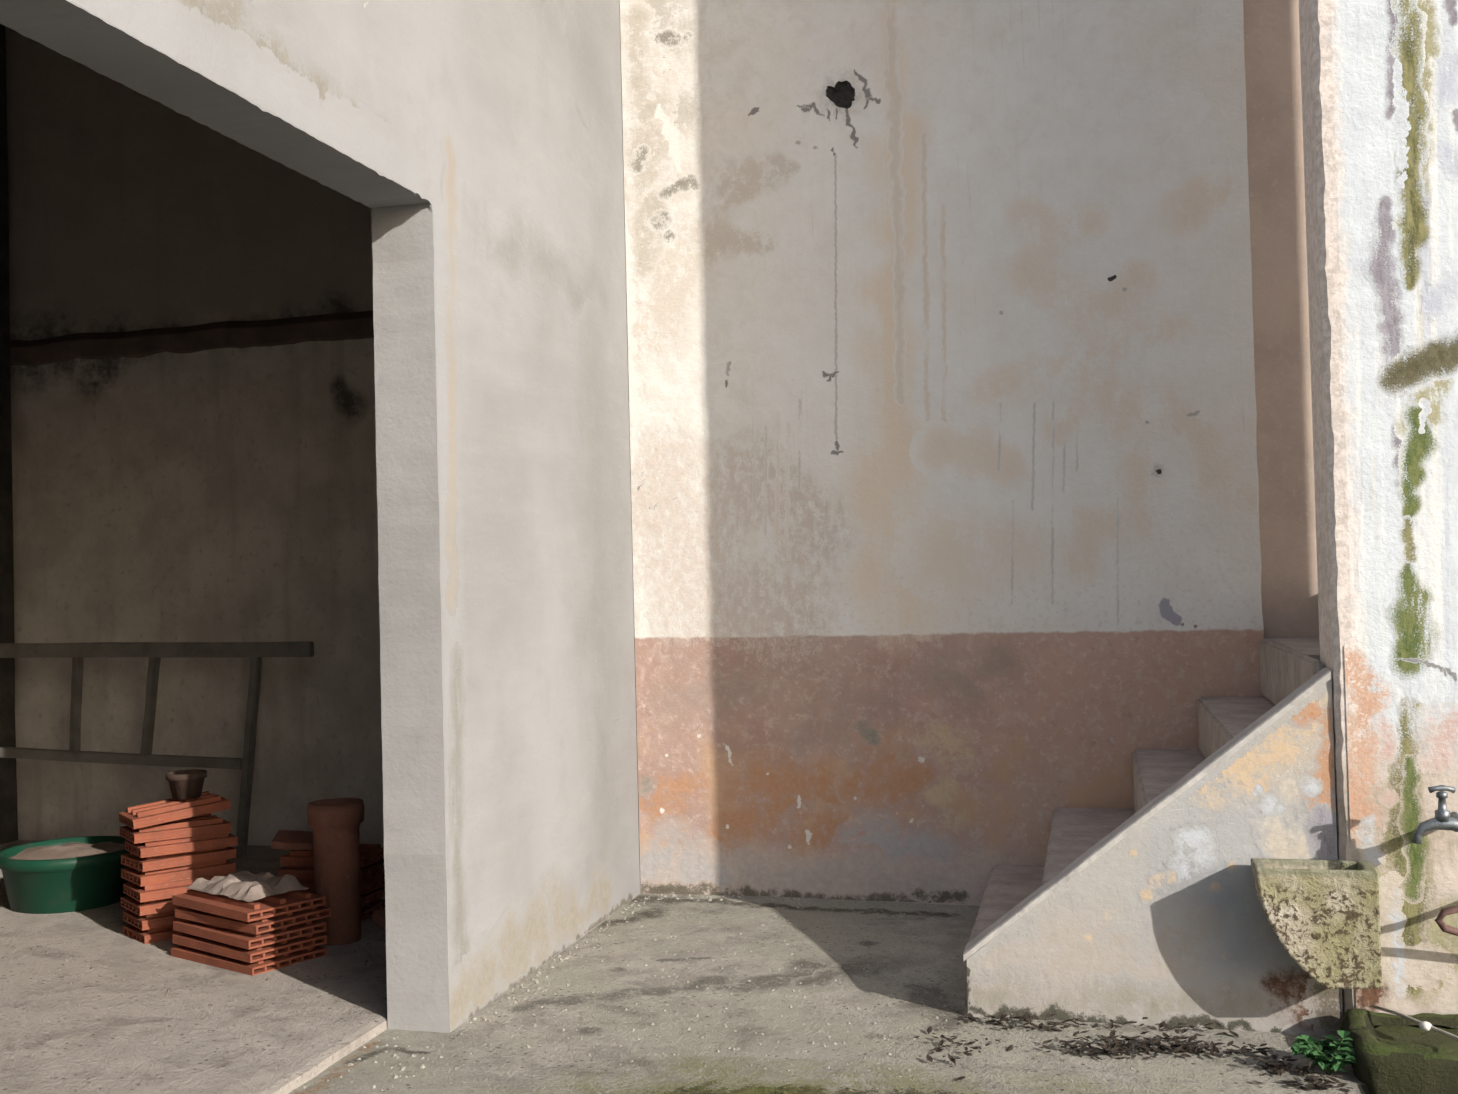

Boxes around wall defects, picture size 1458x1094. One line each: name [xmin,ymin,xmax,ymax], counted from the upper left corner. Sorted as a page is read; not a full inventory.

leakage [622,0,709,143]
spalling [796,64,882,149]
leakage [1384,0,1399,121]
leakage [1432,0,1458,181]
peeling [621,0,836,470]
leakage [1361,194,1458,370]
leakage [1390,422,1404,489]